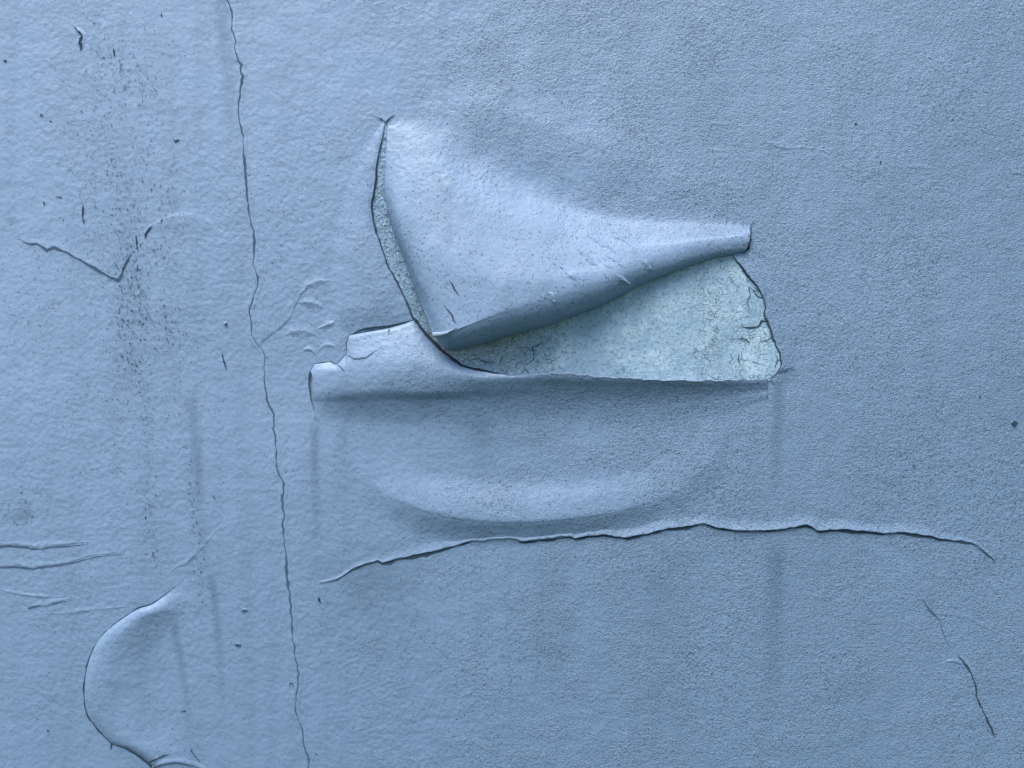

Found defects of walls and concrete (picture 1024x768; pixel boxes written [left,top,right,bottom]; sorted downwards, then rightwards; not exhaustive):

crack [20,225,153,284]
peeling [329,35,804,387]
crack [222,0,314,768]
crack [319,514,995,584]
crack [923,600,996,738]